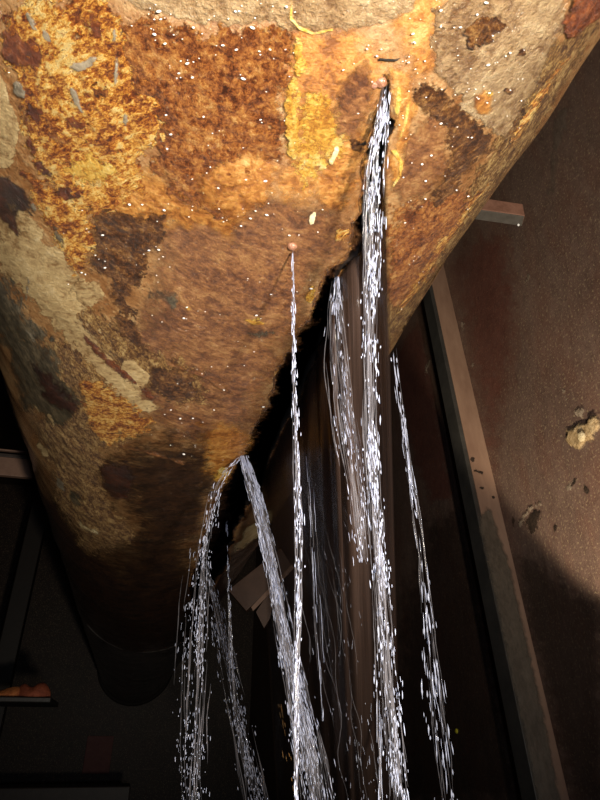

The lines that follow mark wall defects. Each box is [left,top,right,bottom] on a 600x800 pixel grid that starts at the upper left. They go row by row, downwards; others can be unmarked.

crack [188,58,400,597]
corrosion [0,0,600,561]
spalling [511,502,542,534]
spalling [566,408,600,449]